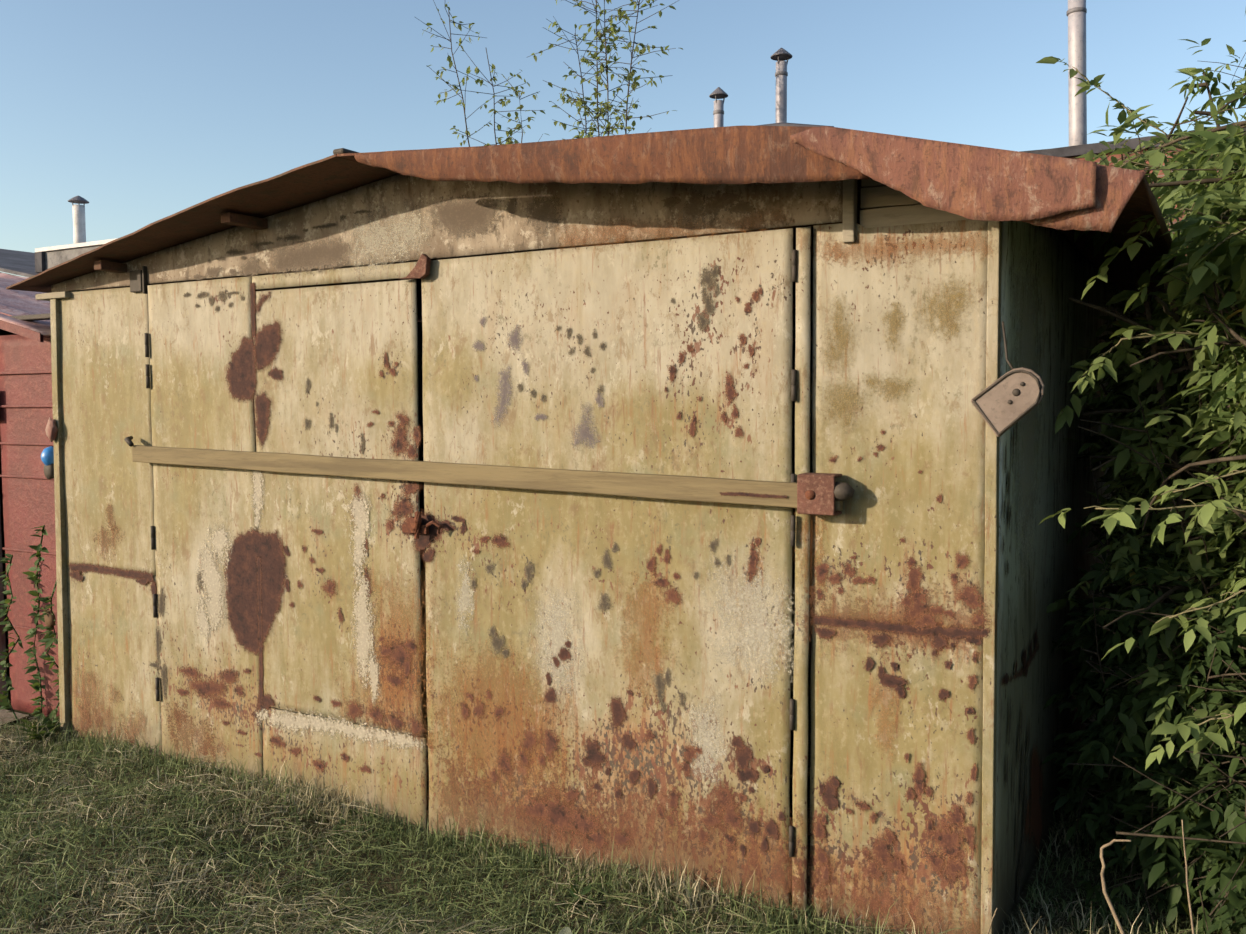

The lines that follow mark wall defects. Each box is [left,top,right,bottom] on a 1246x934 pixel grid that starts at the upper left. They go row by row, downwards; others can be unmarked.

corrosion [735,288,763,315]
corrosion [664,344,694,392]
corrosion [739,334,754,369]
corrosion [380,481,467,563]
corrosion [470,534,510,588]
corrosion [810,538,990,699]
corrosion [544,641,572,703]
corrosion [609,690,655,750]
corrosion [680,745,703,777]
corrosion [522,738,681,853]
corrosion [698,736,784,856]
corrosion [812,776,904,881]